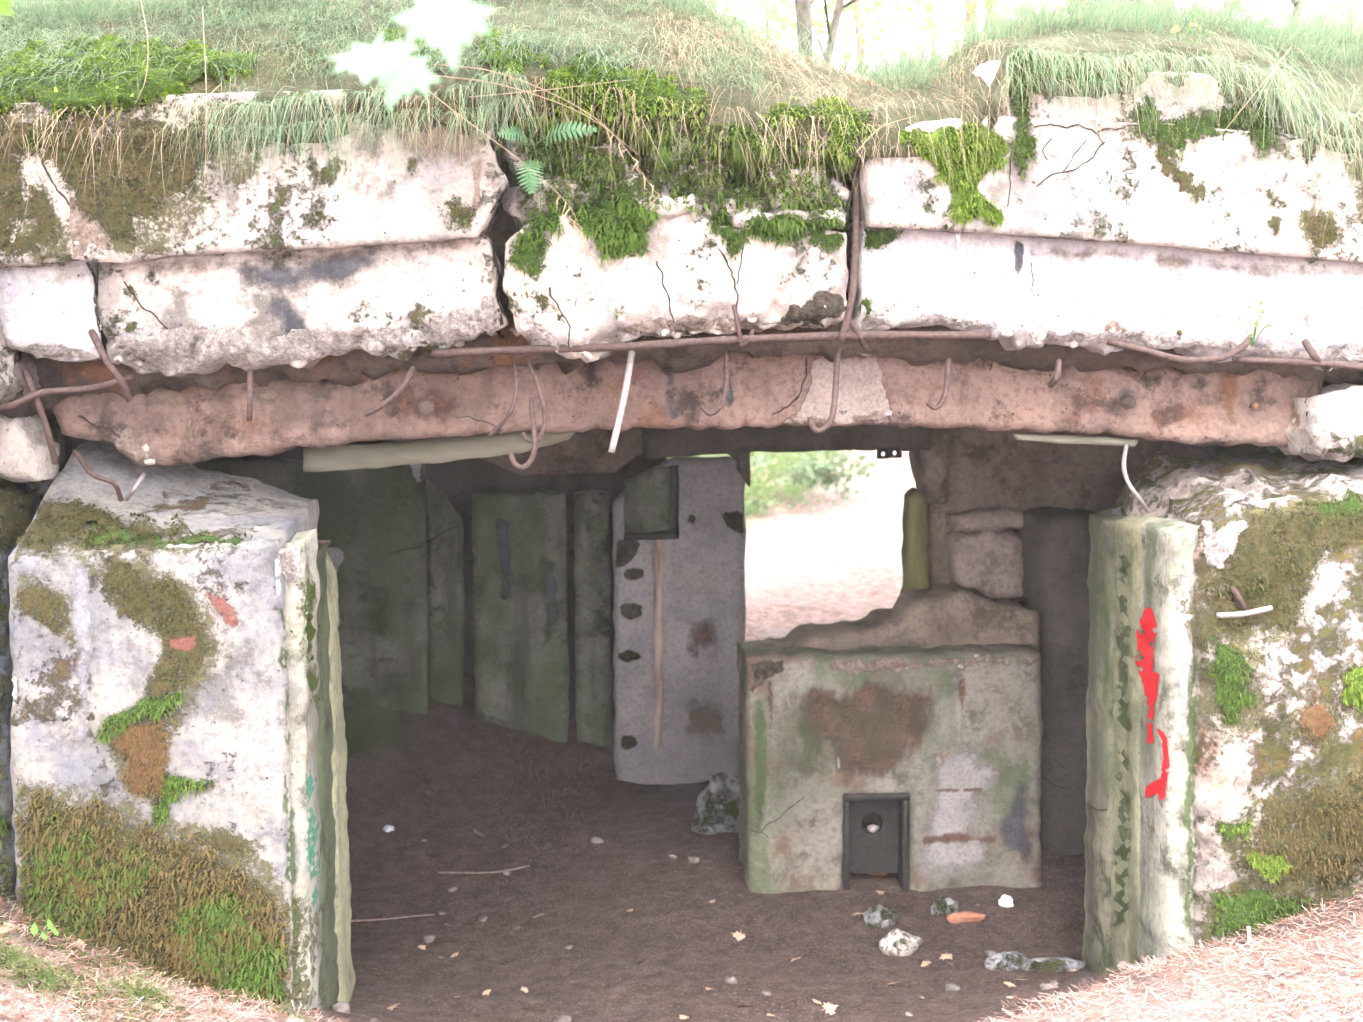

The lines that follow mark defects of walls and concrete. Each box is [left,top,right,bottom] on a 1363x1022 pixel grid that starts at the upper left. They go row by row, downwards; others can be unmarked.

crack [1007,123,1139,237]
crack [1233,126,1350,140]
crack [39,152,168,355]
crack [471,182,509,342]
crack [548,287,571,350]
spalling [0,168,1363,502]
rust [396,388,453,421]